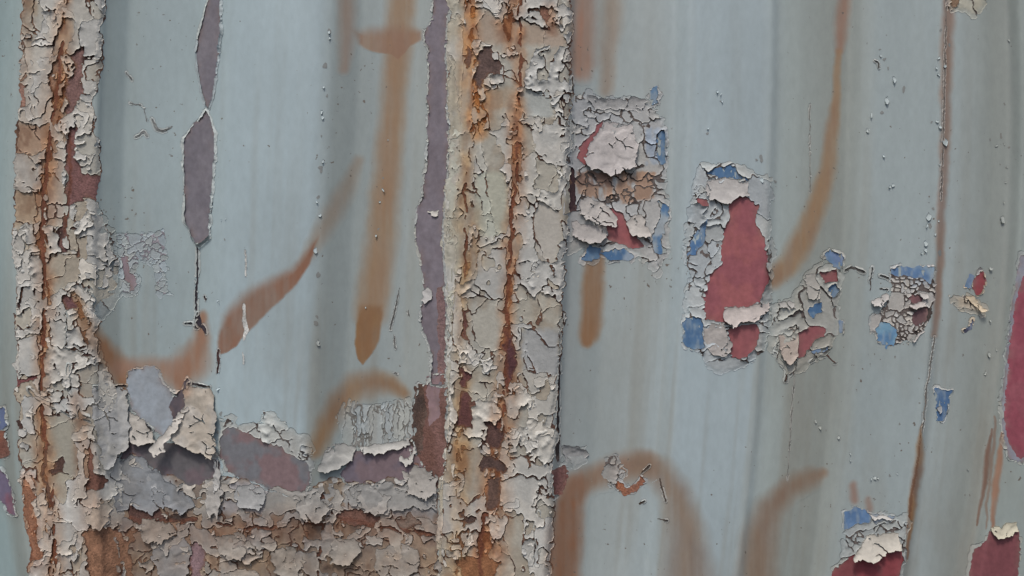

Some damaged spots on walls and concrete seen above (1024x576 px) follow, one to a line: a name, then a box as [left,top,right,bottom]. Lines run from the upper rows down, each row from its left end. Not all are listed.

corrosion [930,0,958,339]
peeling [0,0,672,576]
peeling [681,155,846,378]
peeling [868,207,993,349]
peeling [932,384,954,423]
peeling [988,250,1024,465]
peeling [830,506,913,576]
corrosion [906,424,926,560]
peeling [966,522,1023,576]